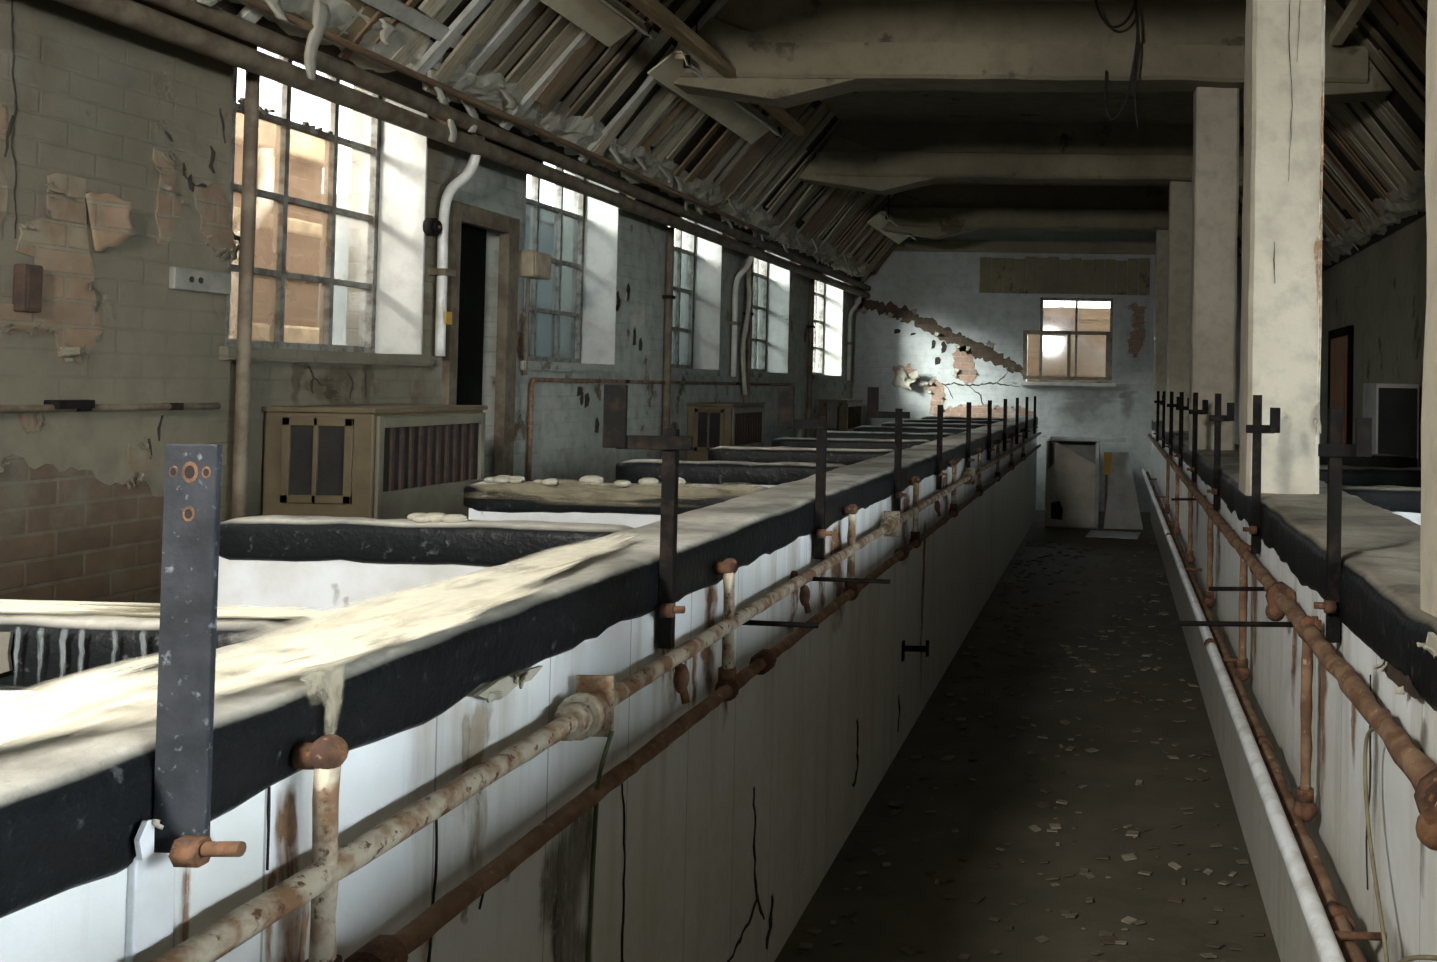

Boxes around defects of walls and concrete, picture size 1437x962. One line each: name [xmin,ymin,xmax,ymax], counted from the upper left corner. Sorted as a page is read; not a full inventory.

spalling [196,0,247,8]
peeling [0,168,137,363]
peeling [152,148,240,263]
spalling [263,0,1034,419]
peeling [0,454,164,611]
corrosion [268,792,298,890]
corrosion [267,906,309,962]